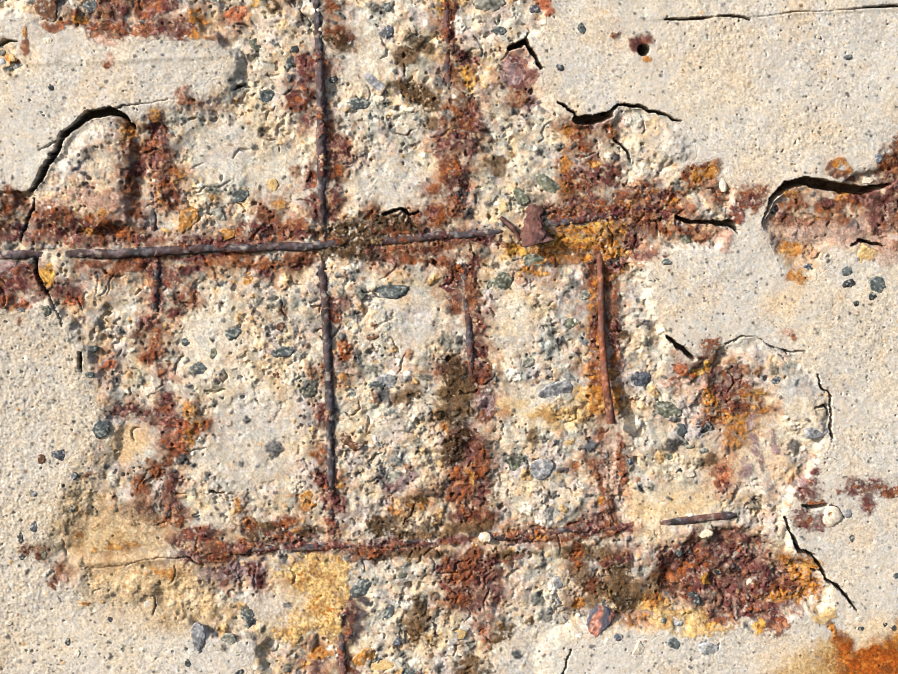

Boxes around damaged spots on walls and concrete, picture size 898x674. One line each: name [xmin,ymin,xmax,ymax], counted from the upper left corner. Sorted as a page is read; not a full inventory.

crack [23,98,175,236]
crack [557,101,680,159]
rust [364,0,898,424]
crack [763,176,884,218]
spalling [762,138,898,288]
spalling [853,276,885,307]
rust [0,51,633,642]
spalling [51,449,65,461]
rust [625,523,823,638]
spalling [776,560,836,624]
crack [783,503,856,610]
rust [779,619,898,674]